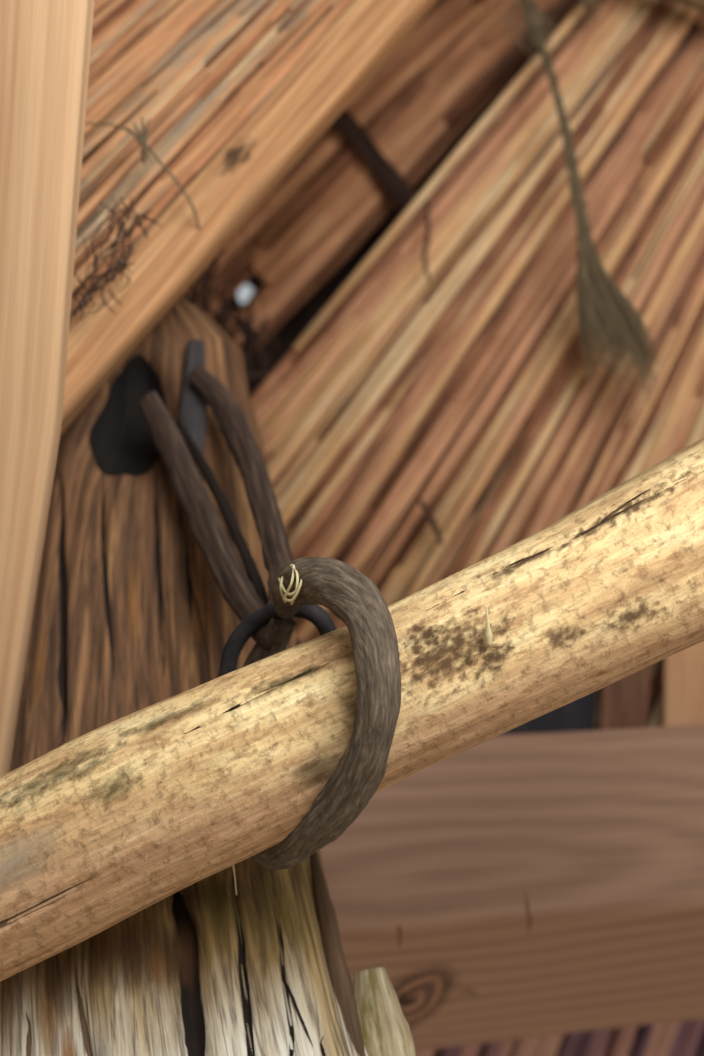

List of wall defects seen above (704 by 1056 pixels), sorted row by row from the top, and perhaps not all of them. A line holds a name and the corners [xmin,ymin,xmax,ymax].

crack [495,490,647,575]
mould [399,609,514,693]
crack [0,878,91,928]
crack [172,891,206,1056]
crack [232,873,255,1056]
crack [272,879,326,1056]